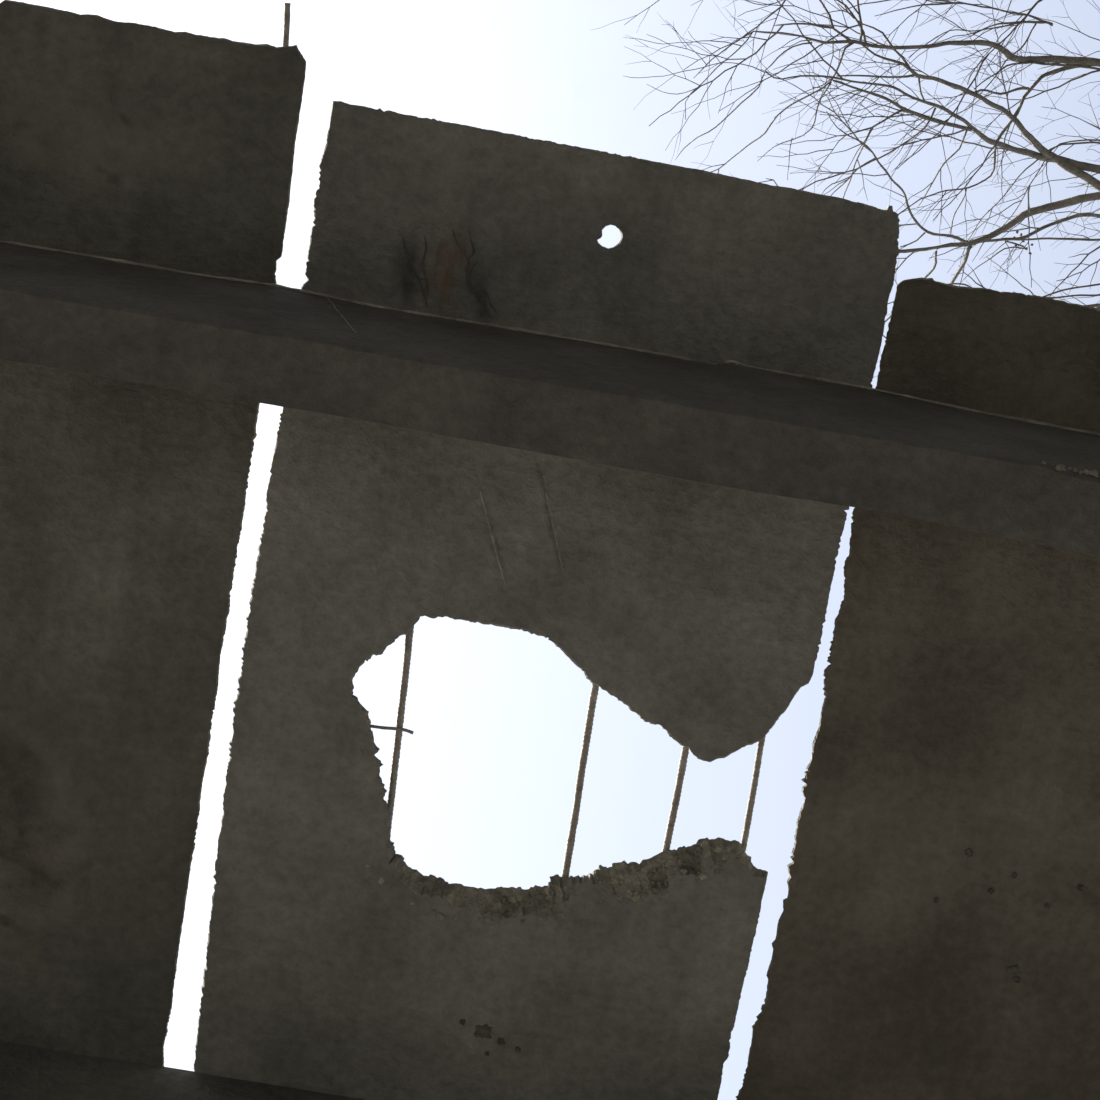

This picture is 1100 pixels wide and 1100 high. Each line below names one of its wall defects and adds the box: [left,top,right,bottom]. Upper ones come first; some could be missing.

spalling [387,626,414,839]
spalling [407,683,599,925]
spalling [600,735,766,903]